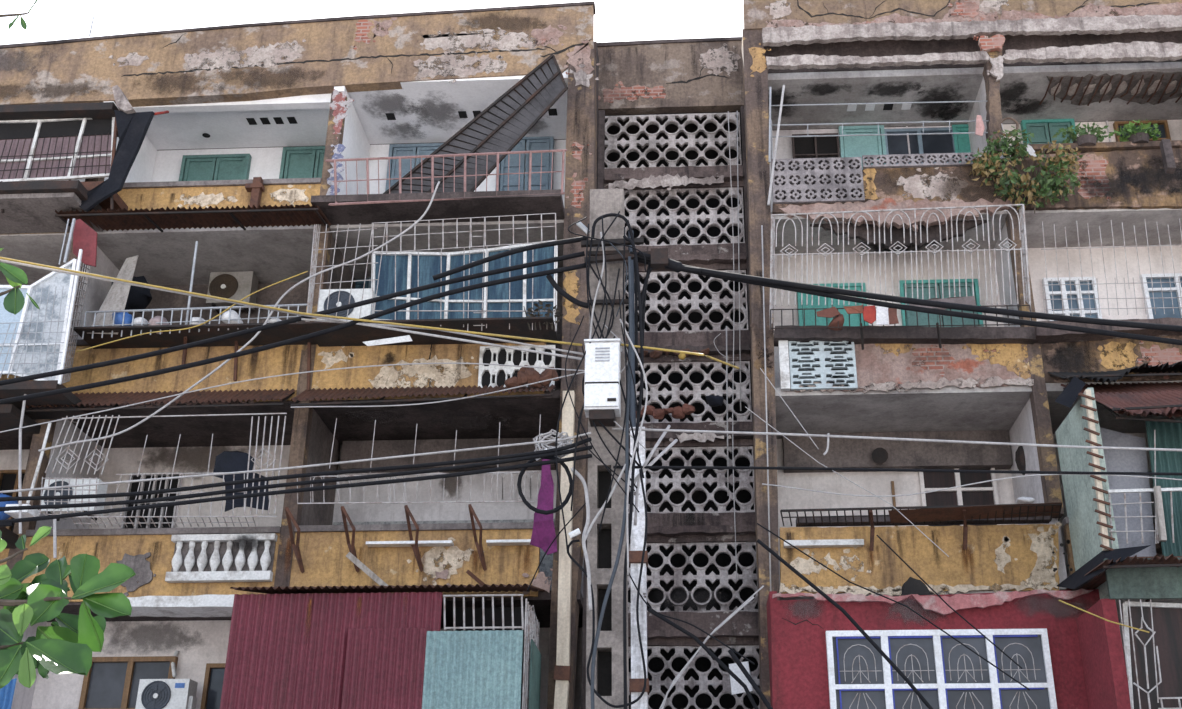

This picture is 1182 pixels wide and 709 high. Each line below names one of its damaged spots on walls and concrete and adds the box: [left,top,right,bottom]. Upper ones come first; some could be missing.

crack [797,0,950,19]
crack [1067,0,1159,15]
crack [121,34,592,77]
crack [666,66,727,84]
damp [758,88,795,116]
mould [808,84,847,95]
mould [869,83,962,121]
mould [1000,82,1045,115]
flaking render [896,167,959,201]
peeling [368,355,479,399]
spalling [790,344,1034,394]
spalling [779,547,902,596]